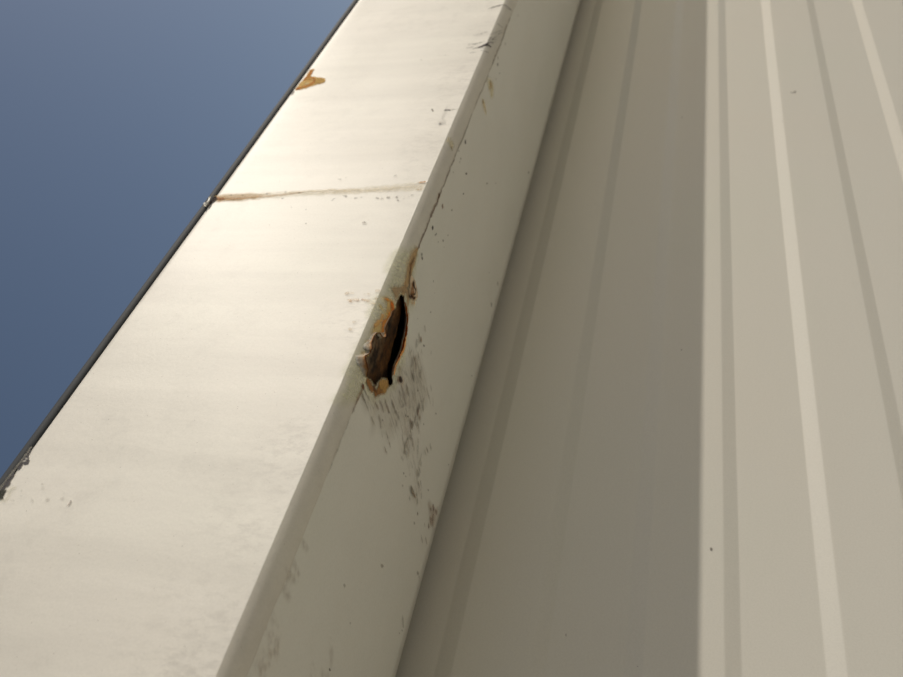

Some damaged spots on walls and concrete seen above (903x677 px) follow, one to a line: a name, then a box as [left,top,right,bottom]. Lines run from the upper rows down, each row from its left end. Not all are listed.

rust [291,69,325,94]
rust [355,294,408,386]